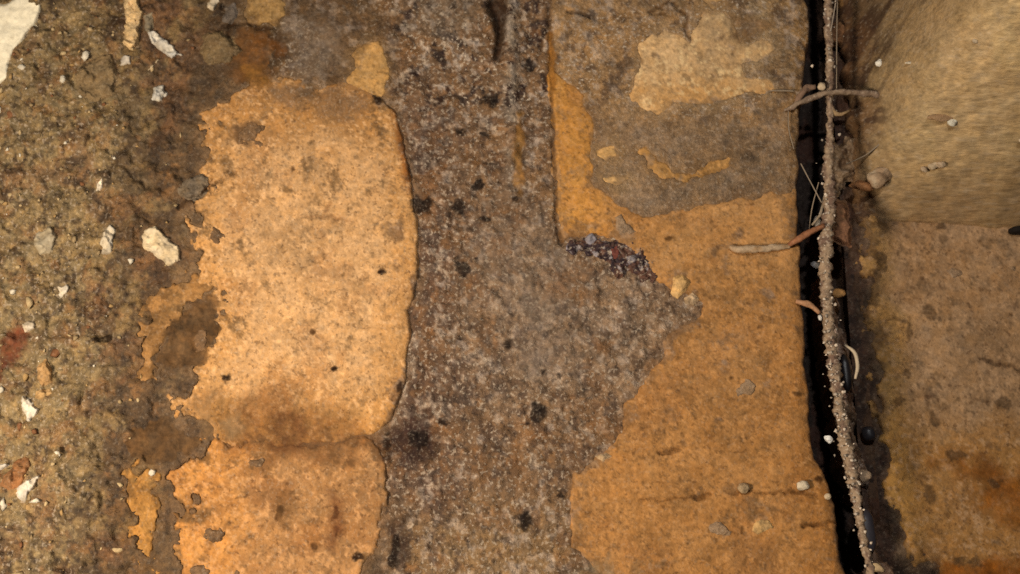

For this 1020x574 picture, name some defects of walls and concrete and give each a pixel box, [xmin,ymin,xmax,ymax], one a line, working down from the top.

damp [523,57,536,72]
damp [480,94,497,108]
damp [410,198,431,214]
damp [451,200,465,215]
damp [454,257,478,277]
spalling [121,41,419,574]
spalling [547,67,846,574]
damp [526,402,546,425]
damp [408,431,428,450]
damp [518,512,531,532]